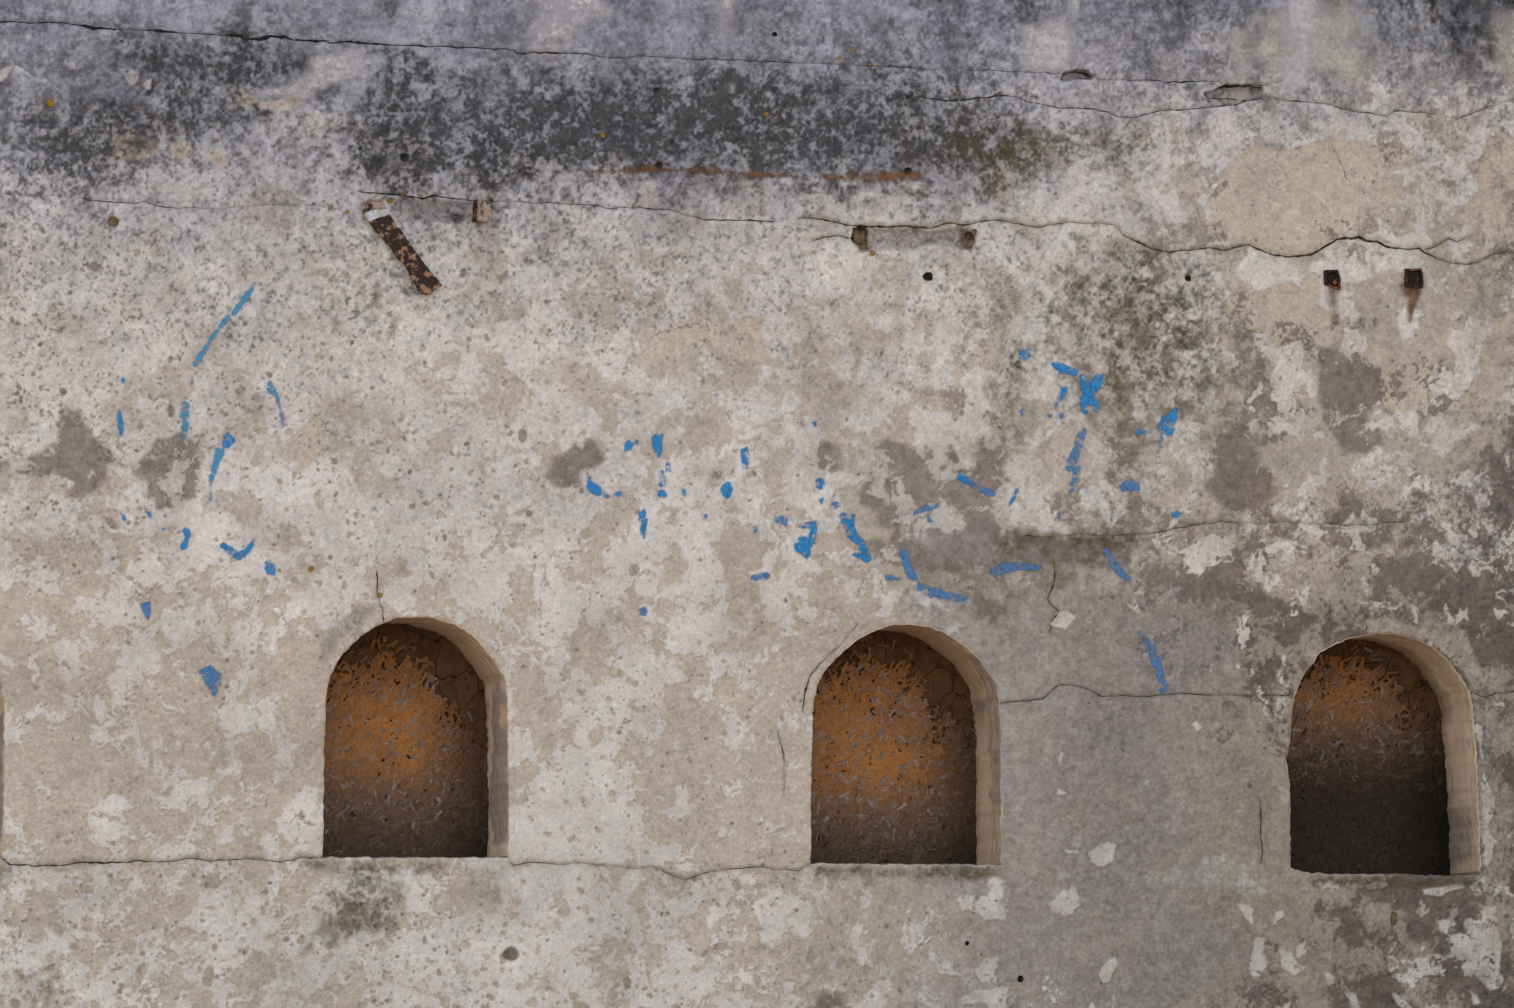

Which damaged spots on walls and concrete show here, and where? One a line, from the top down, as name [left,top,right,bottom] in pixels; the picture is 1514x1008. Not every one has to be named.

crack [0,7,1505,119]
leakage [1023,0,1079,69]
leakage [1230,0,1361,87]
leakage [30,33,360,169]
leakage [343,0,1040,202]
corrosion [625,165,721,173]
corrosion [824,171,919,181]
crack [9,191,1512,265]
corrosion [1401,283,1420,320]
peeling [1365,617,1487,689]
crack [1001,684,1292,704]
peeling [1387,723,1514,1008]